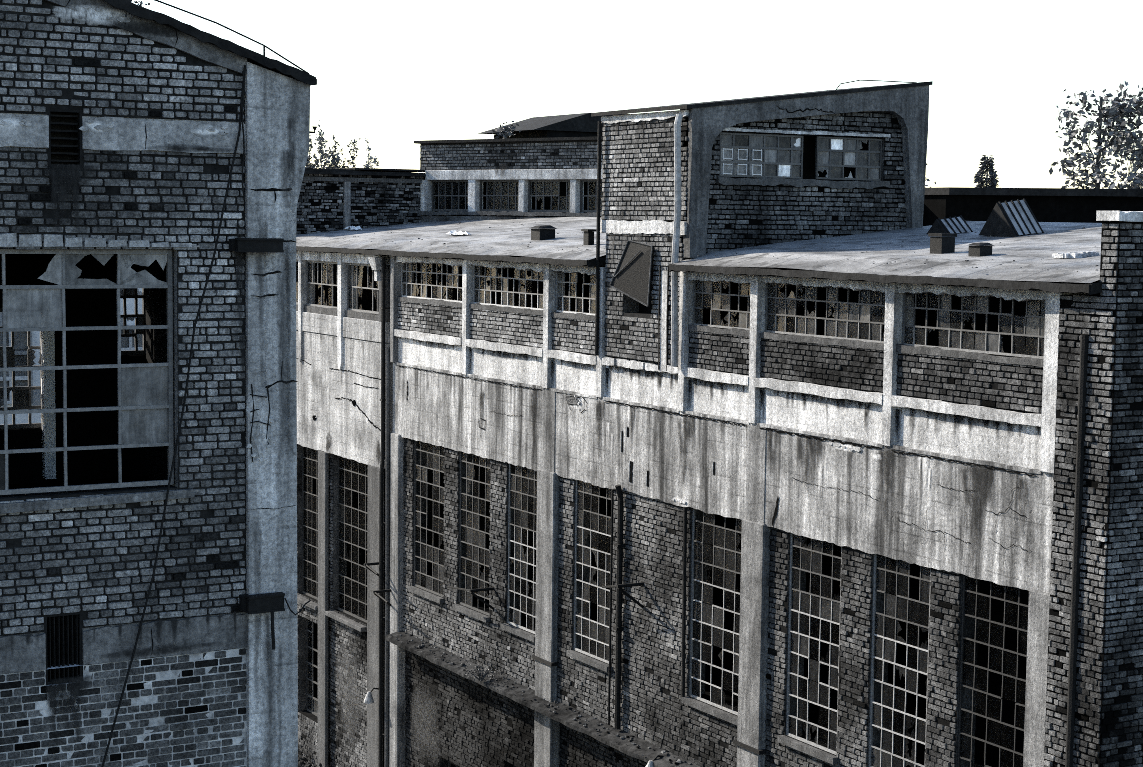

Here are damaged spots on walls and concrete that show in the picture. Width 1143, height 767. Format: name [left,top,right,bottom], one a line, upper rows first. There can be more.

crack [250,188,292,201]
crack [253,270,282,298]
water stain [400,337,537,367]
water stain [551,358,744,402]
water stain [596,402,634,431]
water stain [759,387,873,421]
crack [265,358,1036,565]
water stain [678,415,700,462]
water stain [798,437,822,478]
water stain [866,448,902,507]
water stain [949,463,993,525]